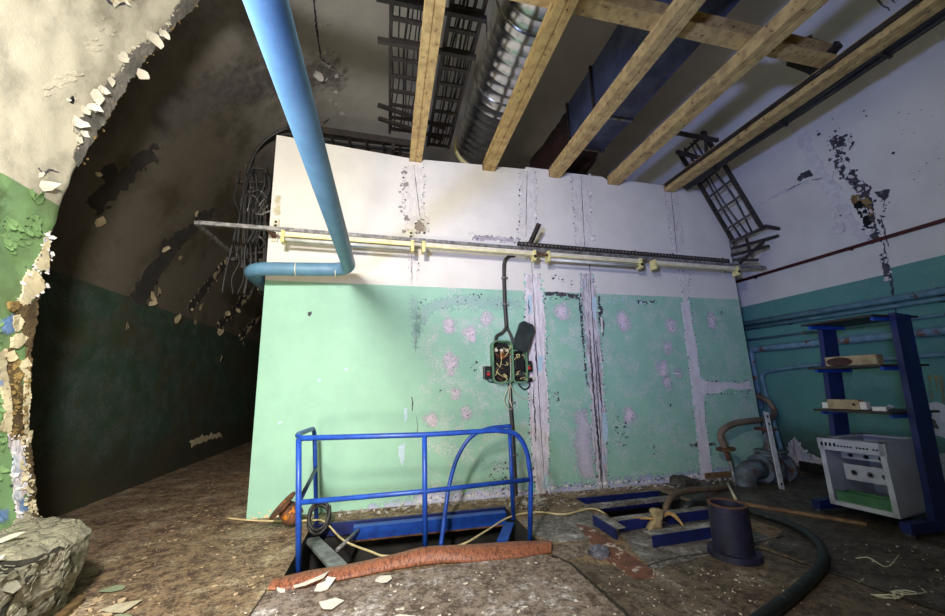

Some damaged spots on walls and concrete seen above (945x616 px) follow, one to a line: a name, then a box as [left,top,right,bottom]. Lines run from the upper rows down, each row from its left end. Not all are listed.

flaking render [66,0,201,167]
peeling [86,143,159,227]
peeling [128,207,216,308]
flaking render [817,118,897,313]
flaking render [0,168,77,616]
peeling [411,262,659,494]
peeling [929,402,945,438]